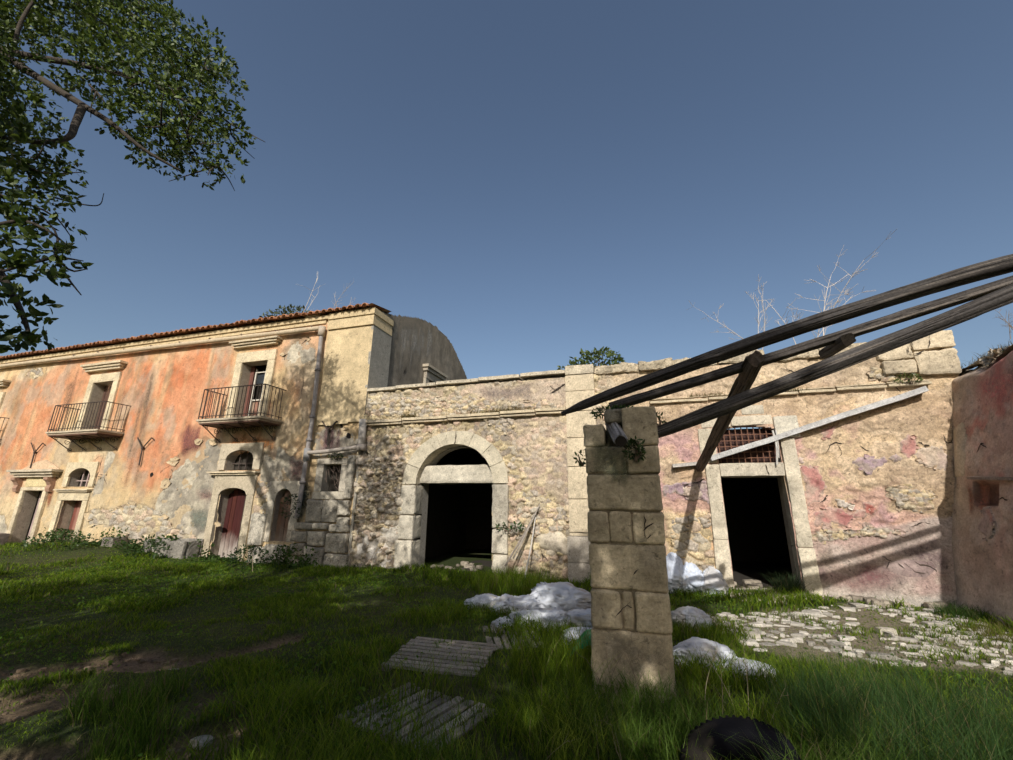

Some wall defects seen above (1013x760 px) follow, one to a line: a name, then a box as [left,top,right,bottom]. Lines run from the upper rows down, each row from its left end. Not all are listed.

flaking render [84,438,223,546]
flaking render [662,480,715,572]